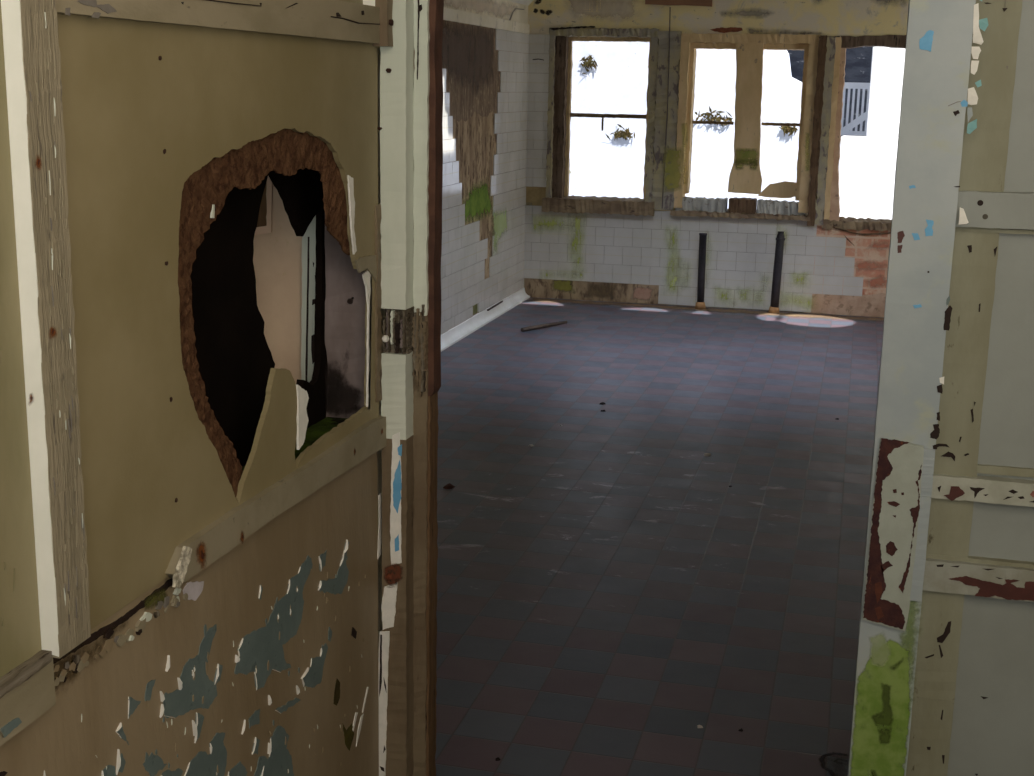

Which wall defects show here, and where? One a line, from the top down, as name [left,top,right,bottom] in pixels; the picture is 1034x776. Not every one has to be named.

peeling [948,0,988,134]
peeling [442,20,501,279]
flaking render [804,219,934,317]
peeling [958,208,969,225]
peeling [377,432,402,565]
peeling [937,486,988,501]
peeling [53,578,204,689]
peeling [101,540,366,776]
peeling [340,582,398,776]
corrosion [384,564,402,585]
damp [872,684,893,743]
peeling [937,564,1034,601]